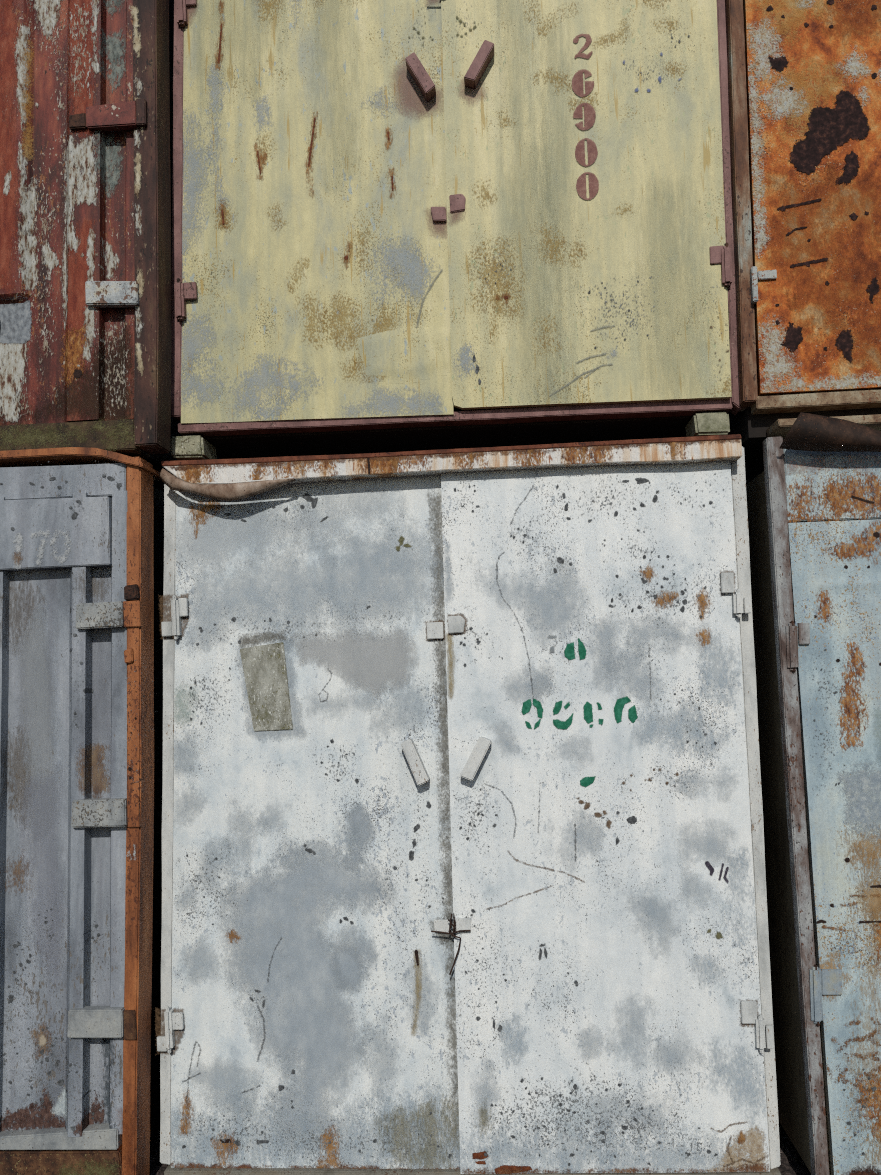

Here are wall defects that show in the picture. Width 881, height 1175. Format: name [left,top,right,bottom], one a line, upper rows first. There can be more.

peeling [0,0,144,422]
corrosion [170,444,648,483]
corrosion [662,439,740,459]
corrosion [189,497,222,538]
corrosion [787,471,881,569]
corrosion [653,592,679,608]
corrosion [696,591,710,646]
corrosion [815,590,833,623]
corrosion [836,642,868,750]
corrosion [844,833,881,969]
corrosion [856,1070,881,1139]
corrosion [846,1166,881,1175]